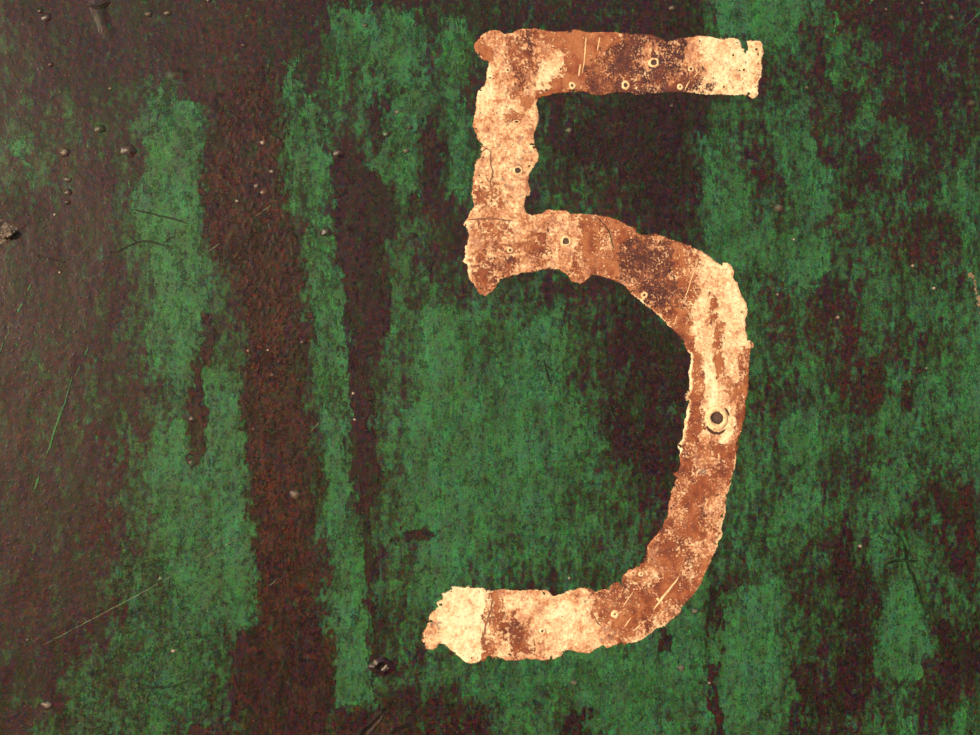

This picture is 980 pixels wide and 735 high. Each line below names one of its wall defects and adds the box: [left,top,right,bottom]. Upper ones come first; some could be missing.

corrosion [474,28,716,126]
peeling [0,219,19,244]
corrosion [471,176,553,293]
corrosion [568,214,752,645]
corrosion [481,591,540,661]